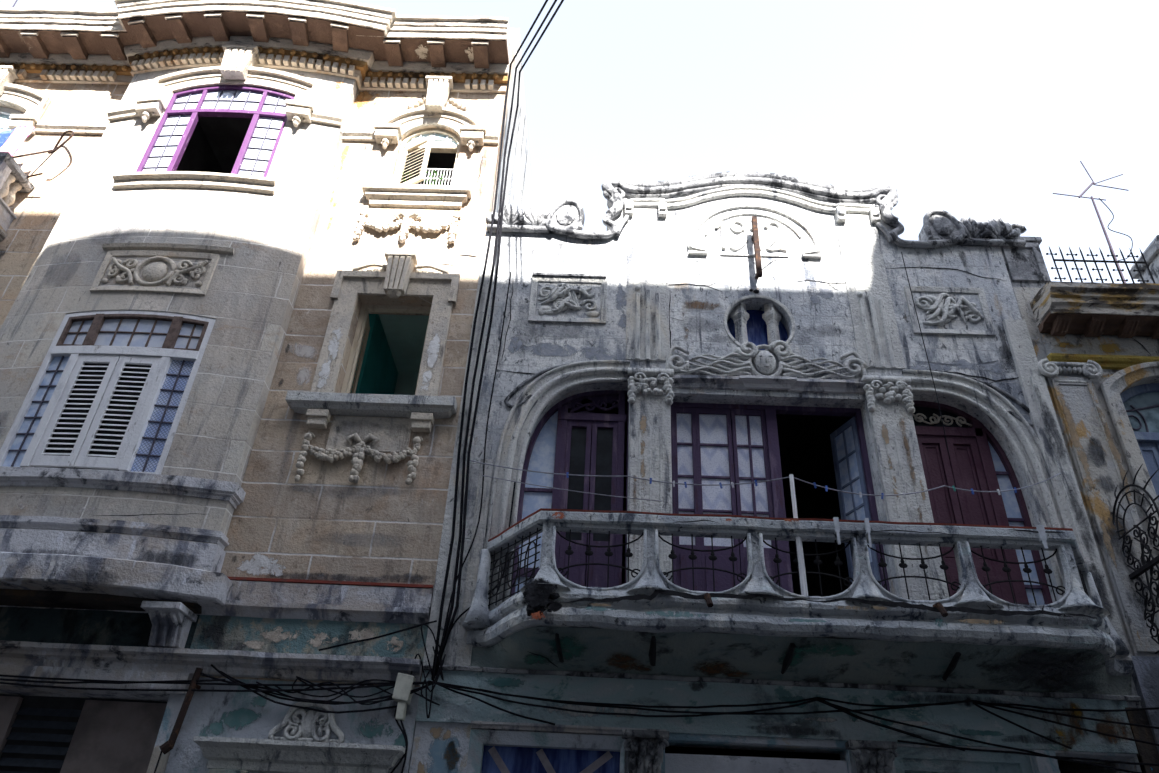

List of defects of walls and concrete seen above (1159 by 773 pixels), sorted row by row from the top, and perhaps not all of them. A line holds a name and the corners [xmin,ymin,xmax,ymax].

damp [530,242,606,278]
damp [1035,388,1065,457]
damp [1089,438,1116,491]
damp [1070,492,1092,552]
damp [136,550,198,566]
peeling [269,564,286,576]
spalling [522,578,562,620]
damp [1089,566,1112,618]
flaking render [242,626,404,652]
peeling [417,727,463,773]